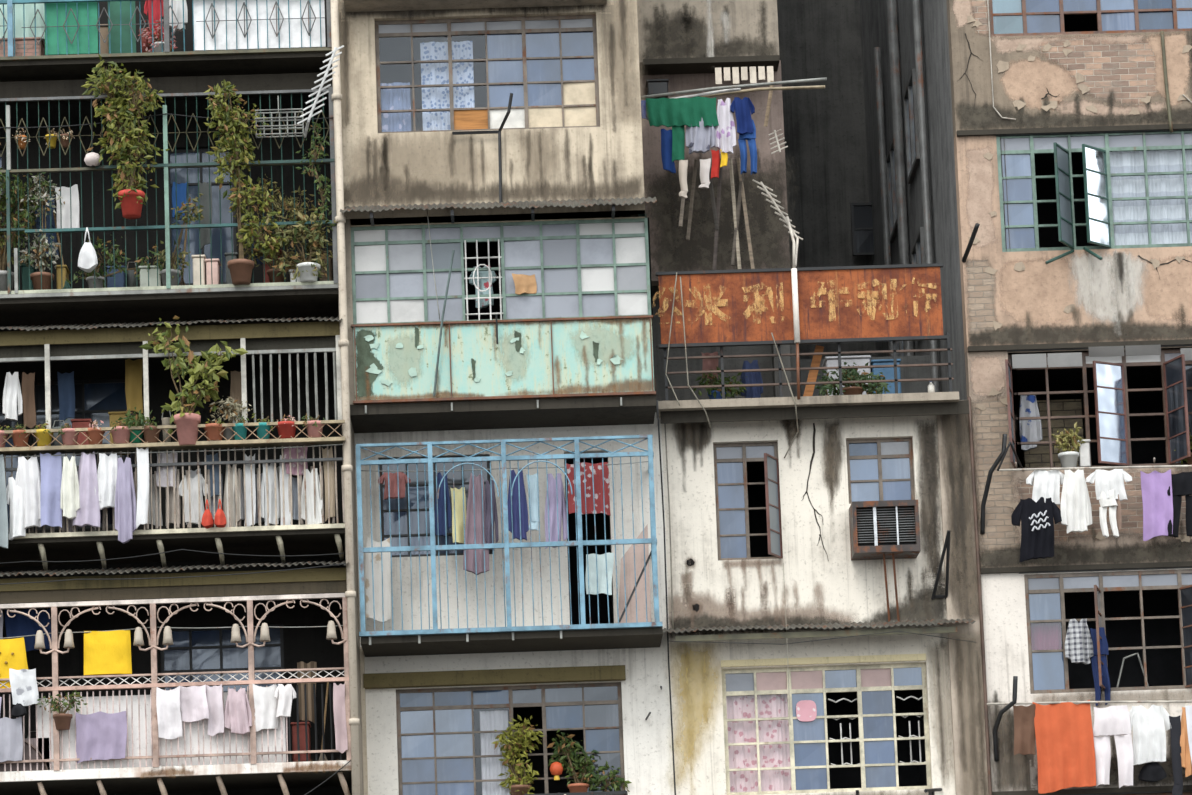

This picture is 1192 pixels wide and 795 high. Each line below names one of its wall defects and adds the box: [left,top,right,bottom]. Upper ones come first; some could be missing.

damp [643,0,775,59]
crack [960,33,981,116]
flaking render [953,0,1192,116]
damp [344,133,640,207]
peeling [355,328,424,398]
peeling [502,331,526,377]
peeling [575,328,634,365]
damp [675,422,711,463]
crack [801,423,829,561]
damp [824,423,841,496]
damp [864,414,1192,628]
damp [670,574,849,635]